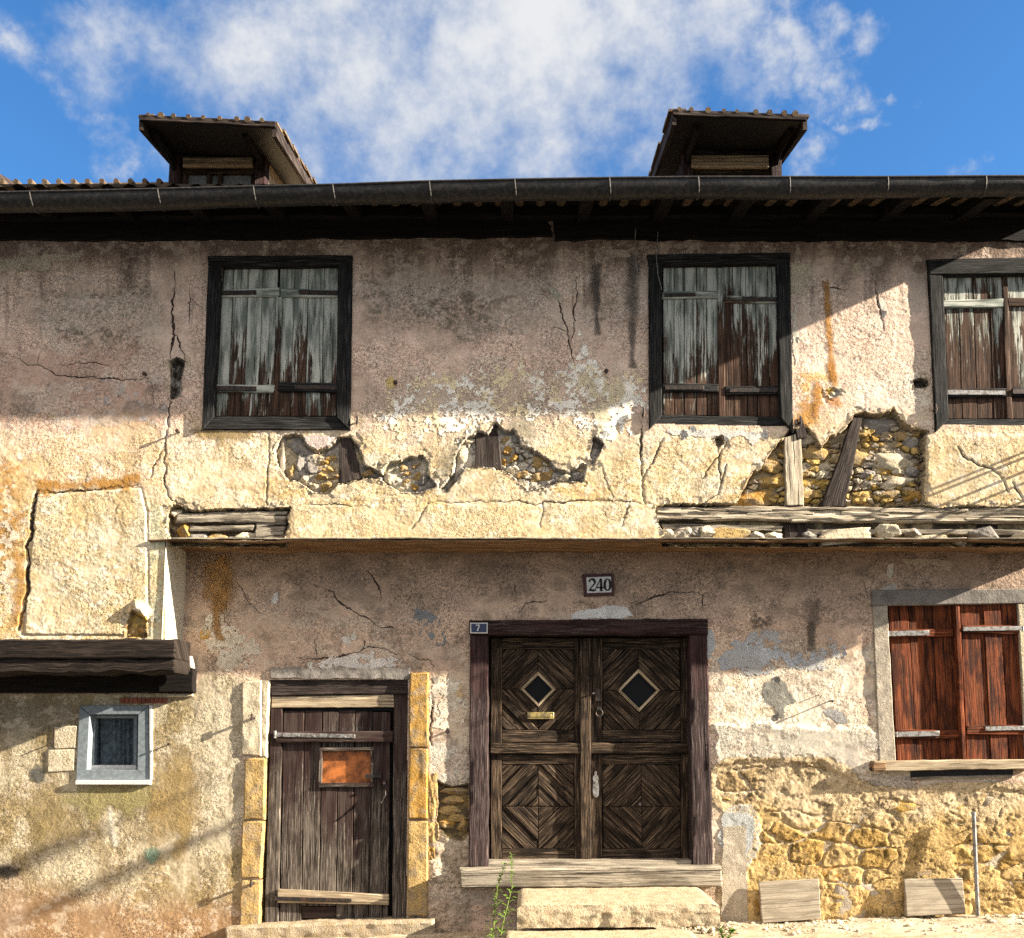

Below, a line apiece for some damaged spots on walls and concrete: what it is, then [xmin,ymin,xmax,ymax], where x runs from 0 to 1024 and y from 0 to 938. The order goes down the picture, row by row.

crack [554,279,578,368]
damp [591,264,601,334]
damp [627,254,639,367]
corrosion [801,282,840,426]
crack [12,271,203,630]
flaking render [273,321,649,493]
flaking render [655,406,1024,590]
crack [958,448,1021,496]
corrosion [204,557,233,640]
crack [296,571,434,669]
flaking render [707,629,847,721]
flaking render [823,708,848,724]